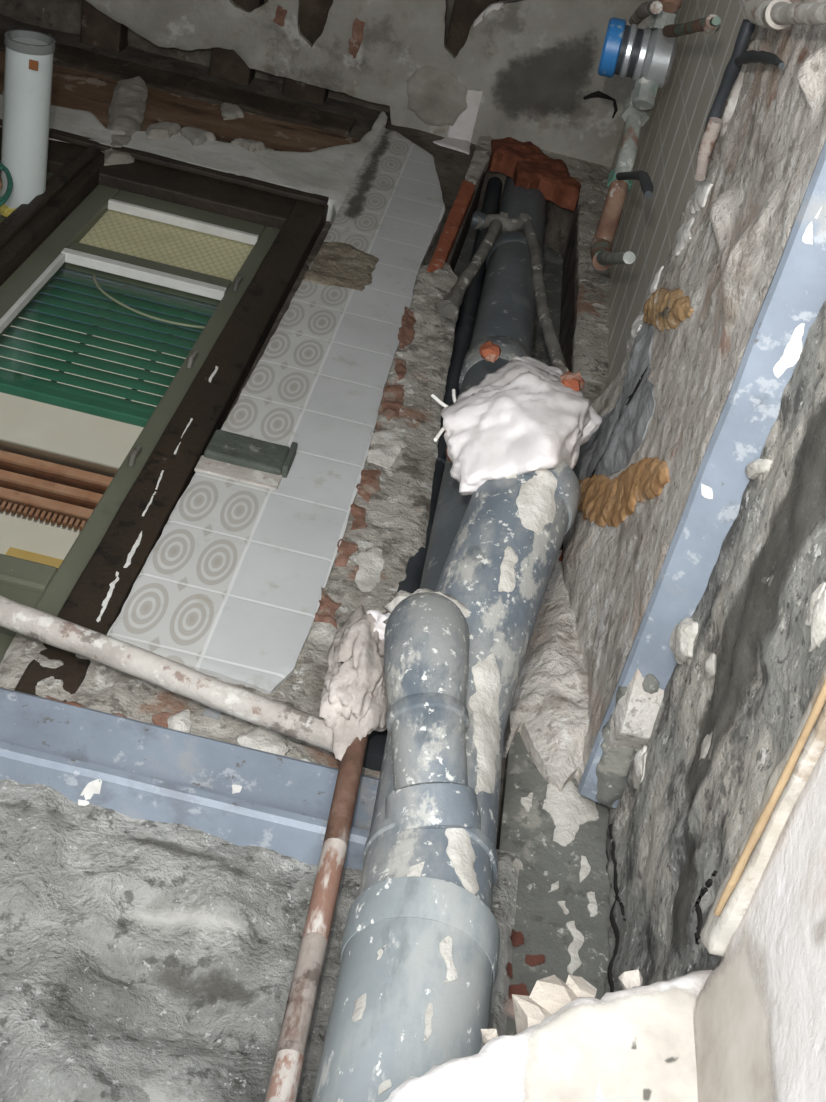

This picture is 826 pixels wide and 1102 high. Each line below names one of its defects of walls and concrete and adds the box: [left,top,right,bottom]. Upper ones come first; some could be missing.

spalling [273,6,287,27]
spalling [348,17,366,58]
peeling [474,1,504,27]
water stain [495,37,593,117]
peeling [433,90,483,155]
spalling [300,242,379,291]
spalling [335,306,416,592]
spalling [314,587,341,629]
crack [607,824,626,992]